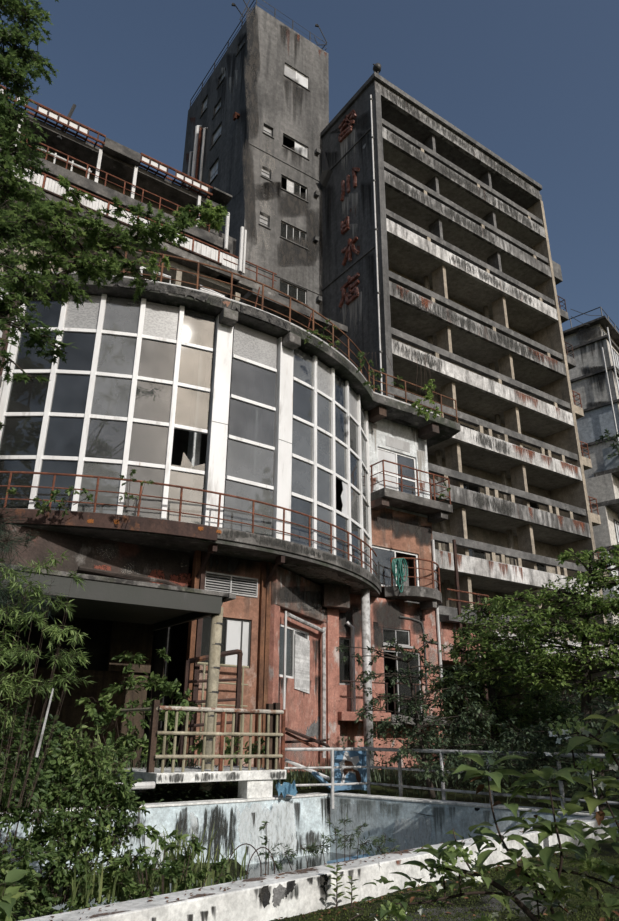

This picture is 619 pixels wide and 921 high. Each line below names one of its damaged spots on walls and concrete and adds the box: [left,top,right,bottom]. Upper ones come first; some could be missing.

water stain [218,9,371,266]
water stain [175,808,236,861]
peeling [237,802,297,862]
peeling [243,867,317,908]